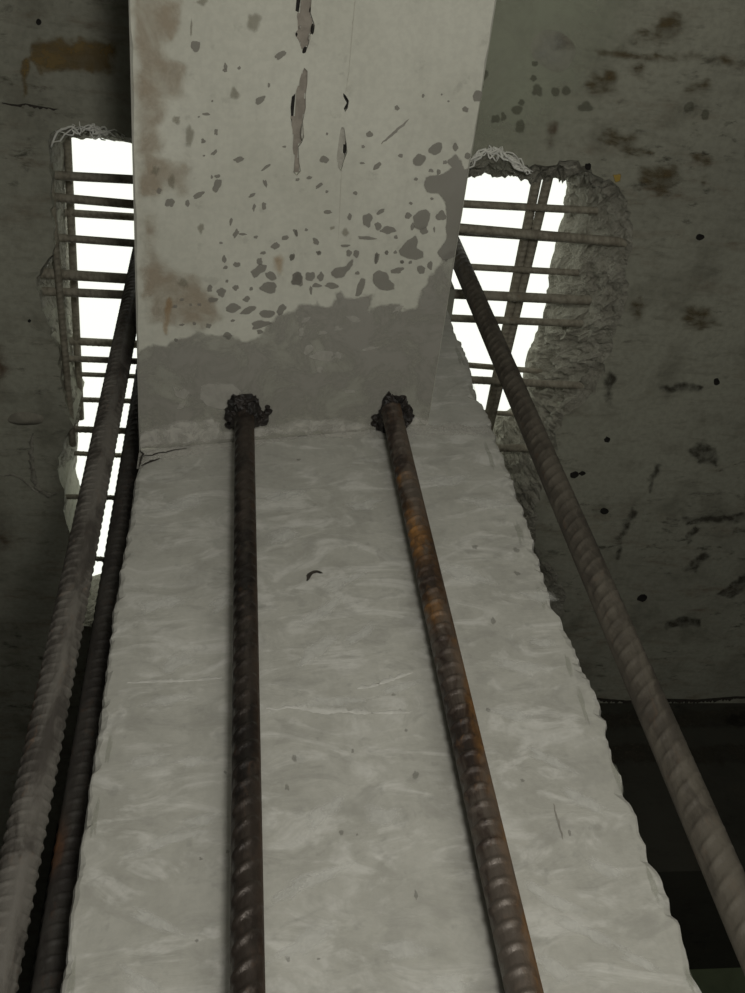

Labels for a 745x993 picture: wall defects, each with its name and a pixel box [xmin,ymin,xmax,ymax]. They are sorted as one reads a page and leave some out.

rust [21,39,115,93]
spalling [296,0,315,53]
spalling [290,68,307,172]
spalling [337,127,346,168]
peeling [200,384,241,409]
spalling [0,127,139,993]
spalling [451,155,745,976]
spalling [229,409,265,993]
spalling [381,402,544,993]